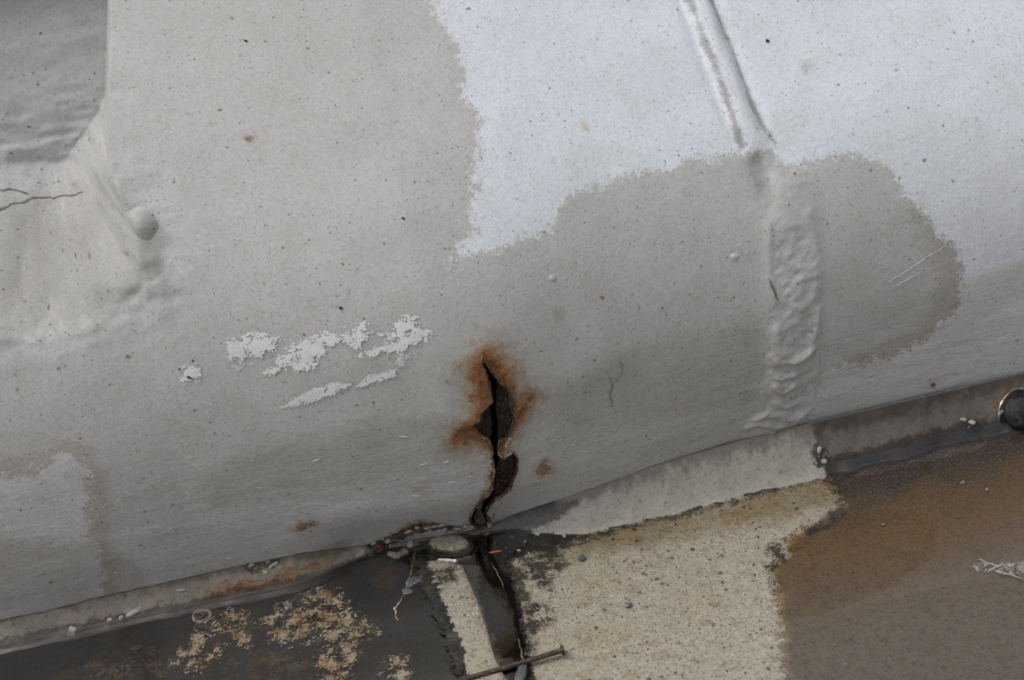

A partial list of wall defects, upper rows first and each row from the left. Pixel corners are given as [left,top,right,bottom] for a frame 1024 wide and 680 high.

crack [0,188,82,209]
peeling [173,360,202,385]
peeling [225,313,433,408]
crack [469,354,519,531]
rust [448,347,541,457]